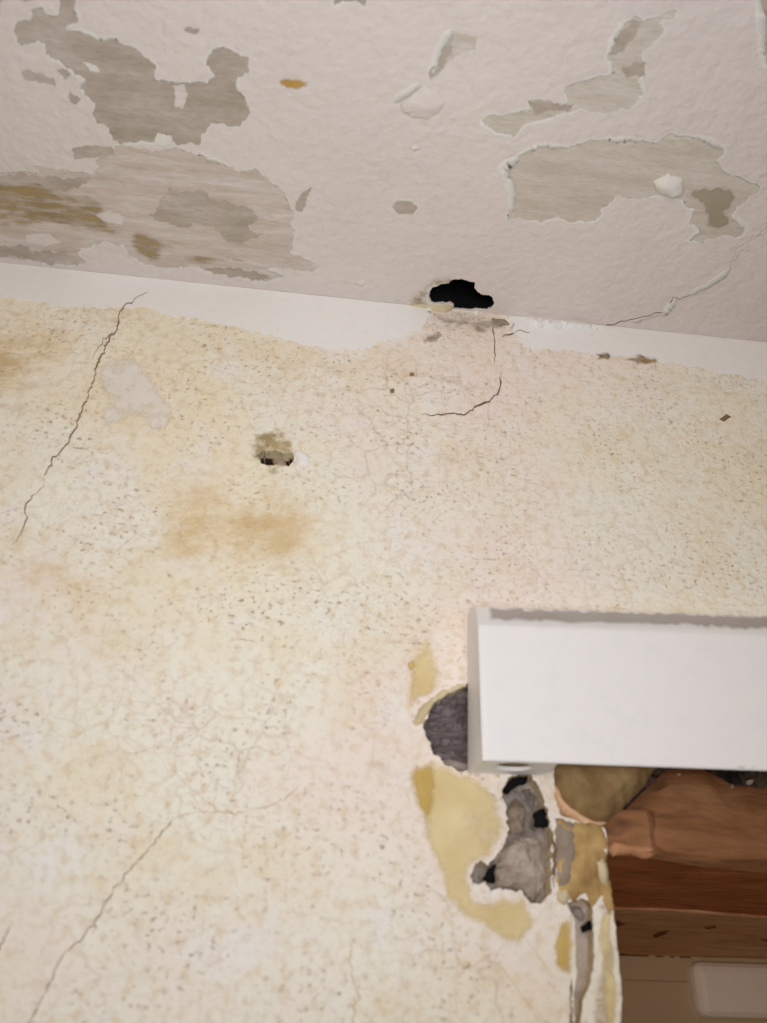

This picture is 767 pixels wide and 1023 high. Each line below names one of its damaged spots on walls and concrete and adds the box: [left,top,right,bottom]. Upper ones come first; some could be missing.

peeling [479,8,680,139]
peeling [754,0,767,75]
peeling [0,0,320,284]
peeling [496,132,762,245]
crack [13,292,146,544]
spalling [255,433,311,467]
crack [421,326,530,416]
spalling [412,684,468,772]
crack [29,783,300,1023]
spalling [470,775,625,926]